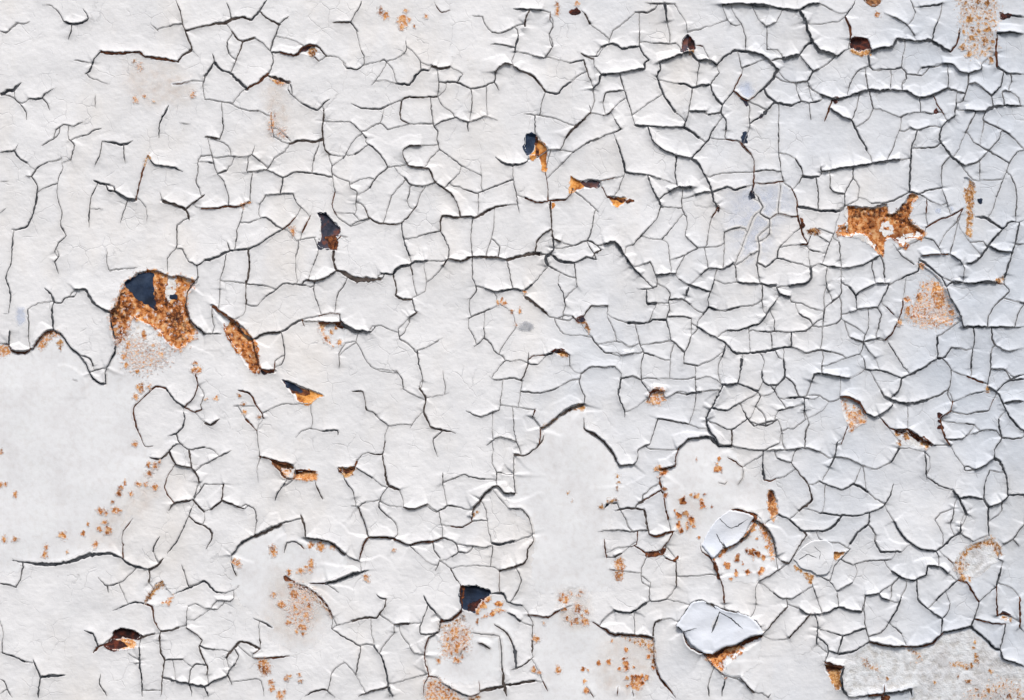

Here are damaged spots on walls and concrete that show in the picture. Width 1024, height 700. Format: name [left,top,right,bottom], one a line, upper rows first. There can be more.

rust [953,0,1004,64]
peeling [317,212,341,250]
crack [85,0,1024,586]
rust [897,262,959,331]
peeling [0,267,204,573]
crack [753,248,1024,698]
peeling [103,628,144,652]
crack [0,521,286,697]
rust [269,540,337,638]
crack [231,408,548,697]
rust [421,611,481,700]
peeling [427,584,519,685]